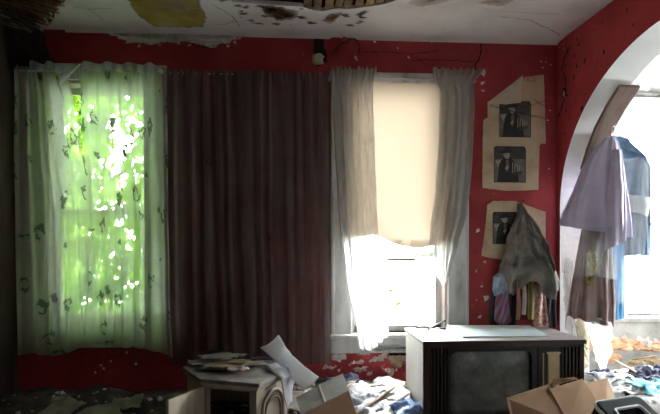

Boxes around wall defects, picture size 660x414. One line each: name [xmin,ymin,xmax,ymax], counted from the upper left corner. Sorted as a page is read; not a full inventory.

leakage [128,0,206,28]
flaking render [109,33,241,48]
crack [362,42,484,71]
peeling [322,353,406,378]